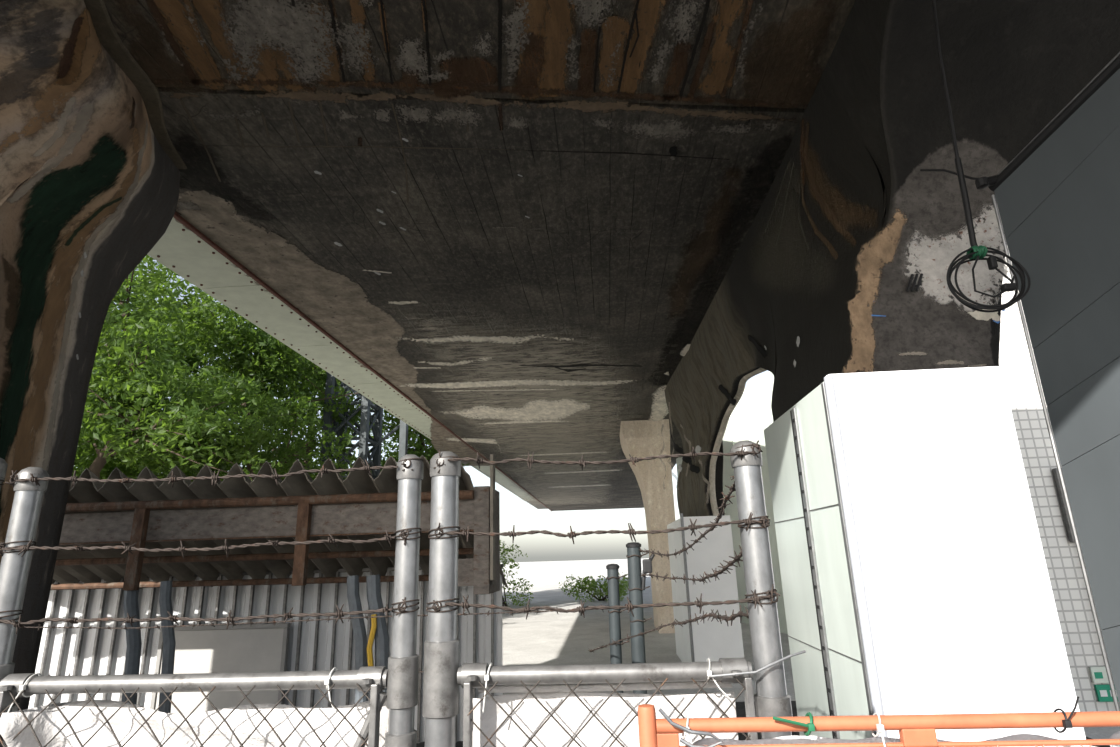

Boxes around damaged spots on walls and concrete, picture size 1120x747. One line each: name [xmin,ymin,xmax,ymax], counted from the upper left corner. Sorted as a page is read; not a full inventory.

water stain [218,0,455,86]
rust [151,0,804,130]
water stain [469,0,532,87]
water stain [562,0,622,84]
water stain [591,0,835,388]
water stain [0,97,148,470]
peeling [175,190,490,466]
spalling [843,205,1010,373]
water stain [397,324,637,505]